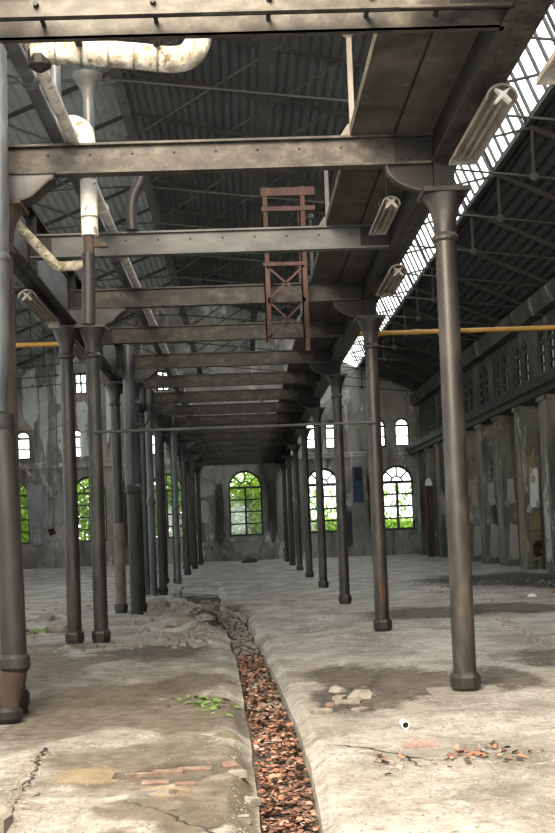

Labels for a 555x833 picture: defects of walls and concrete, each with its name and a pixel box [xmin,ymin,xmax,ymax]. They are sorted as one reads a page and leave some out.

peeling [527,467,555,571]
leakage [305,665,450,708]
leakage [476,649,555,690]
crack [11,748,48,814]